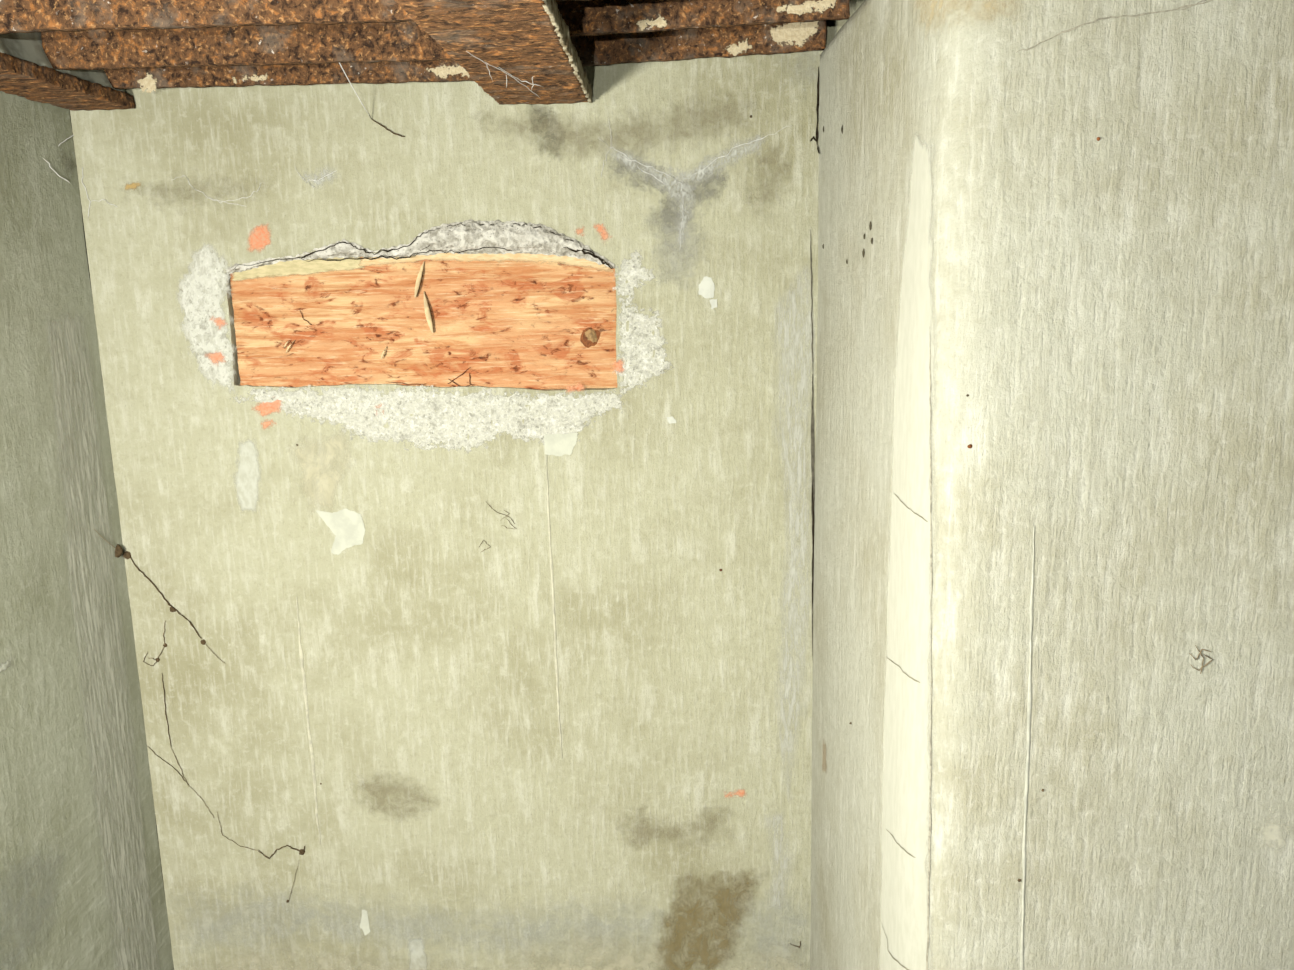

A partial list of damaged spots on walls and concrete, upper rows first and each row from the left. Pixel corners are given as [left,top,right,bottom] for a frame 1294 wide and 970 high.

crack [1016,0,1212,53]
damp [598,125,787,247]
peeling [180,219,674,456]
damp [543,878,752,970]